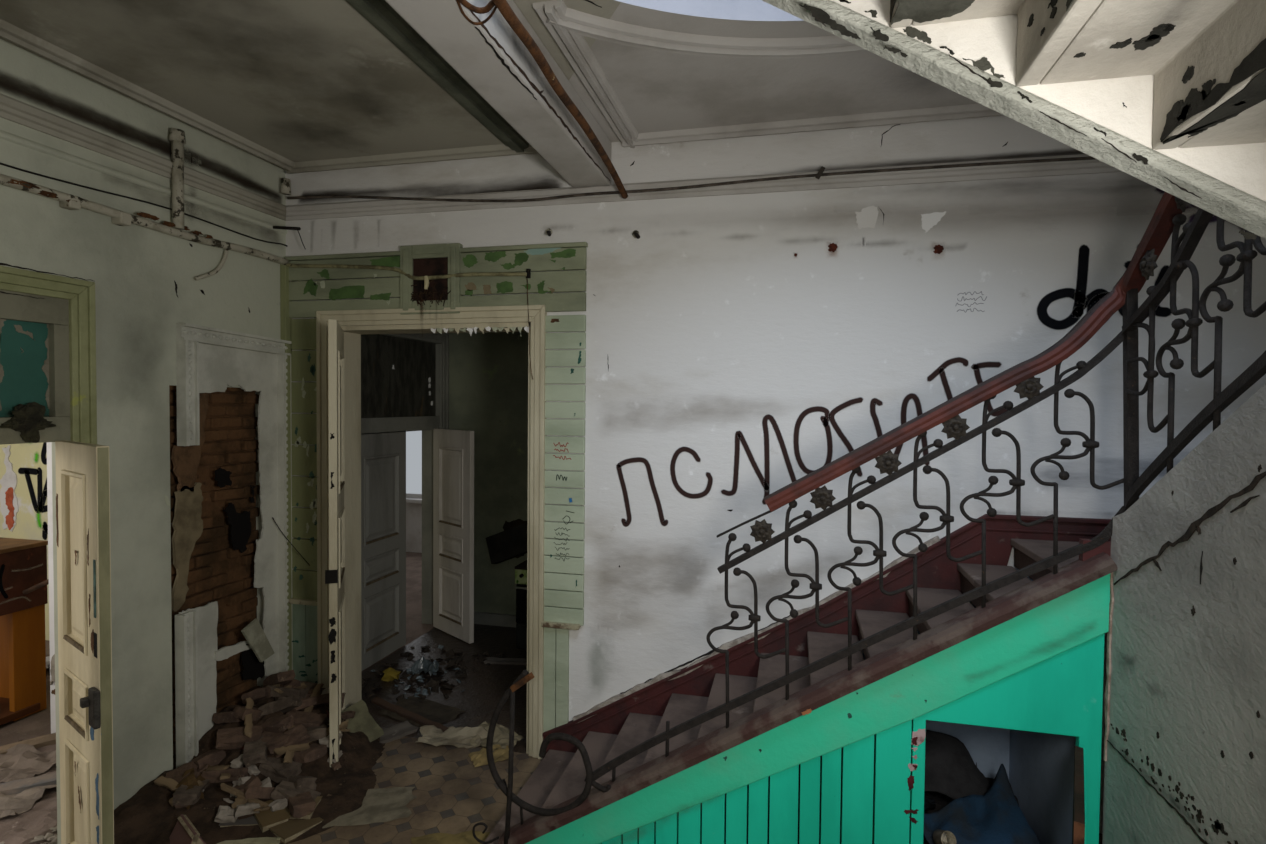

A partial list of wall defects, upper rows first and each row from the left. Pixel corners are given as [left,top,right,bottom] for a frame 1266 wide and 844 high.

peeling [799,0,1005,88]
peeling [1027,0,1074,36]
peeling [1110,23,1176,50]
peeling [1160,38,1266,144]
peeling [8,179,77,204]
peeling [137,212,213,247]
peeling [303,256,400,305]
peeling [463,248,576,296]
peeling [0,319,50,409]
crack [1114,471,1266,585]
flaking render [169,386,265,769]